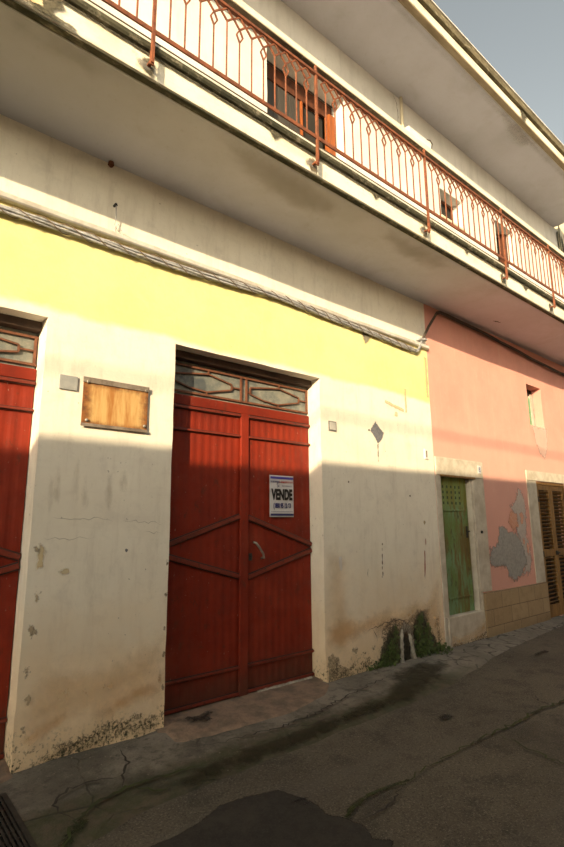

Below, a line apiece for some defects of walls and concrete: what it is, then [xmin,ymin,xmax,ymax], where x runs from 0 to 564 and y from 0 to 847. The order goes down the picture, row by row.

leakage [60,0,564,310]
flaking render [489,489,532,582]
leakage [332,609,441,679]
leakage [43,714,162,760]